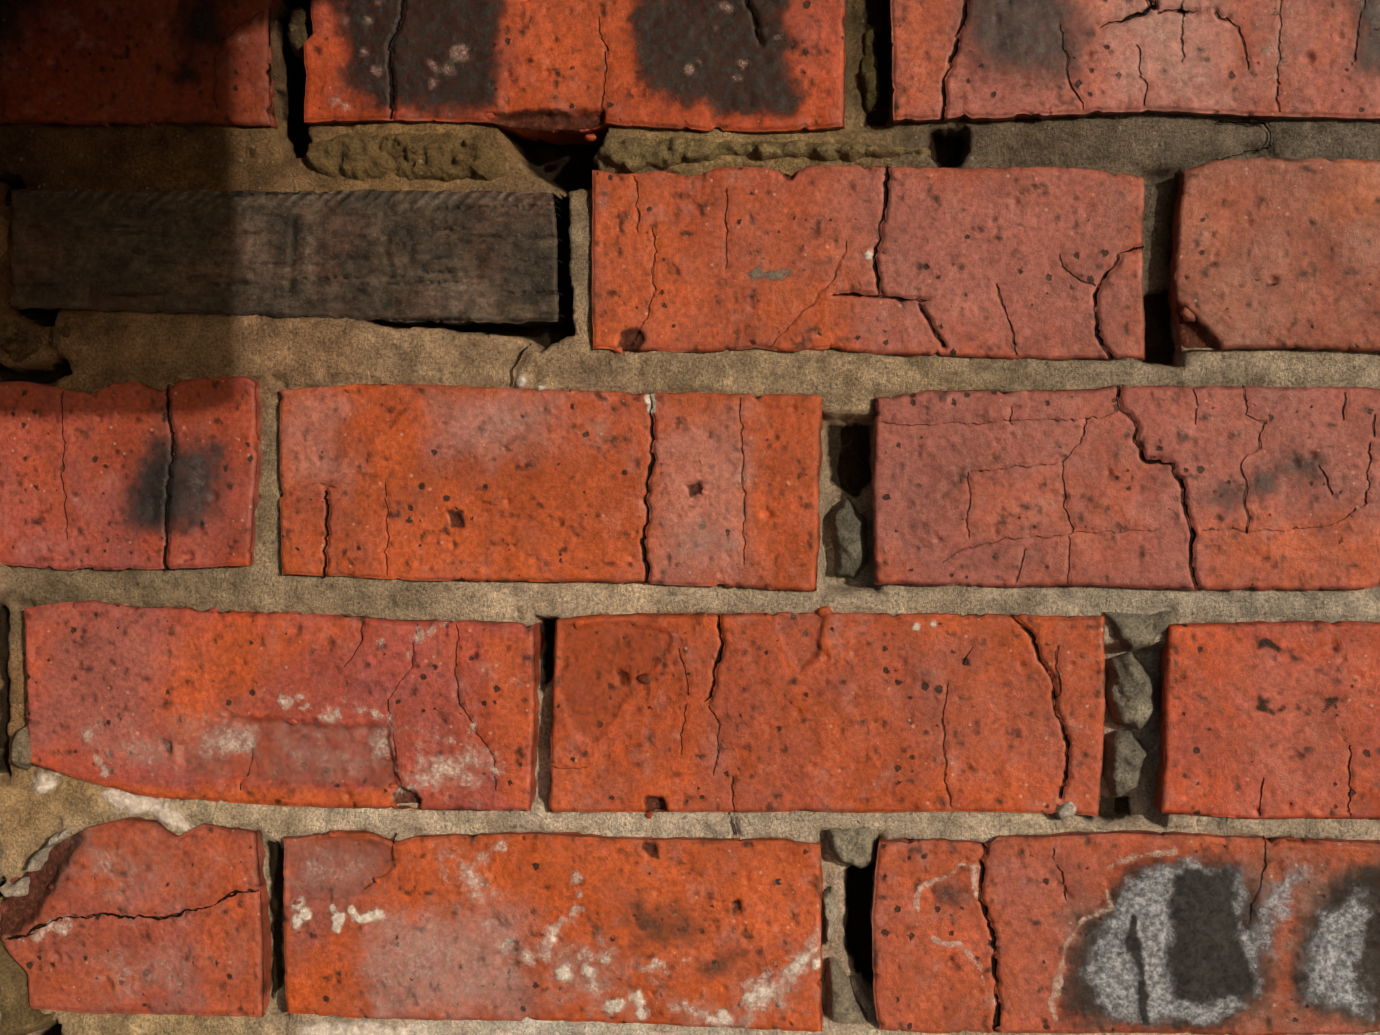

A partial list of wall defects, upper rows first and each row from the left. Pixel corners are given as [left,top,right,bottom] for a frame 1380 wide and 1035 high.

crack [1100,0,1283,161]
crack [776,165,946,347]
crack [641,392,656,583]
crack [879,246,1376,589]
crack [6,889,259,940]
water stain [292,897,311,929]
water stain [330,904,384,933]
water stain [302,1019,448,1035]
water stain [502,873,647,1035]
water stain [683,1002,732,1027]
water stain [743,941,821,1017]
crack [980,842,1001,1029]